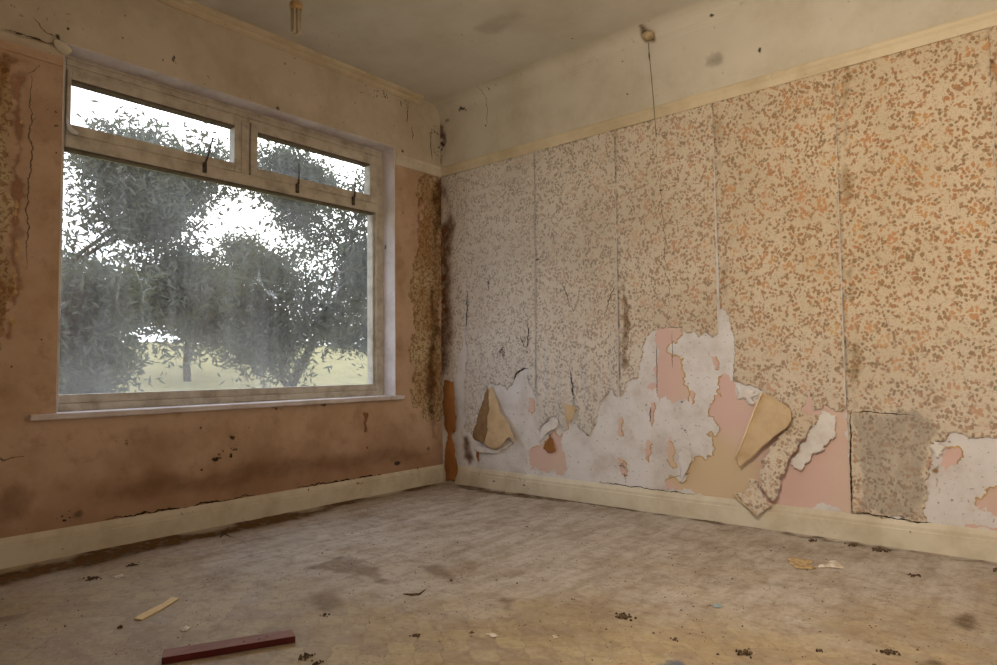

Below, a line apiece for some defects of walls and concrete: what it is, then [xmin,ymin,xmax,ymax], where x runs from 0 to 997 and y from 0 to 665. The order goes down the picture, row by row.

crack [6,20,54,269]
leakage [418,181,454,414]
peeling [647,327,696,426]
peeling [529,430,567,476]
peeling [664,355,851,513]
peeling [941,445,964,470]
peeling [965,485,997,531]